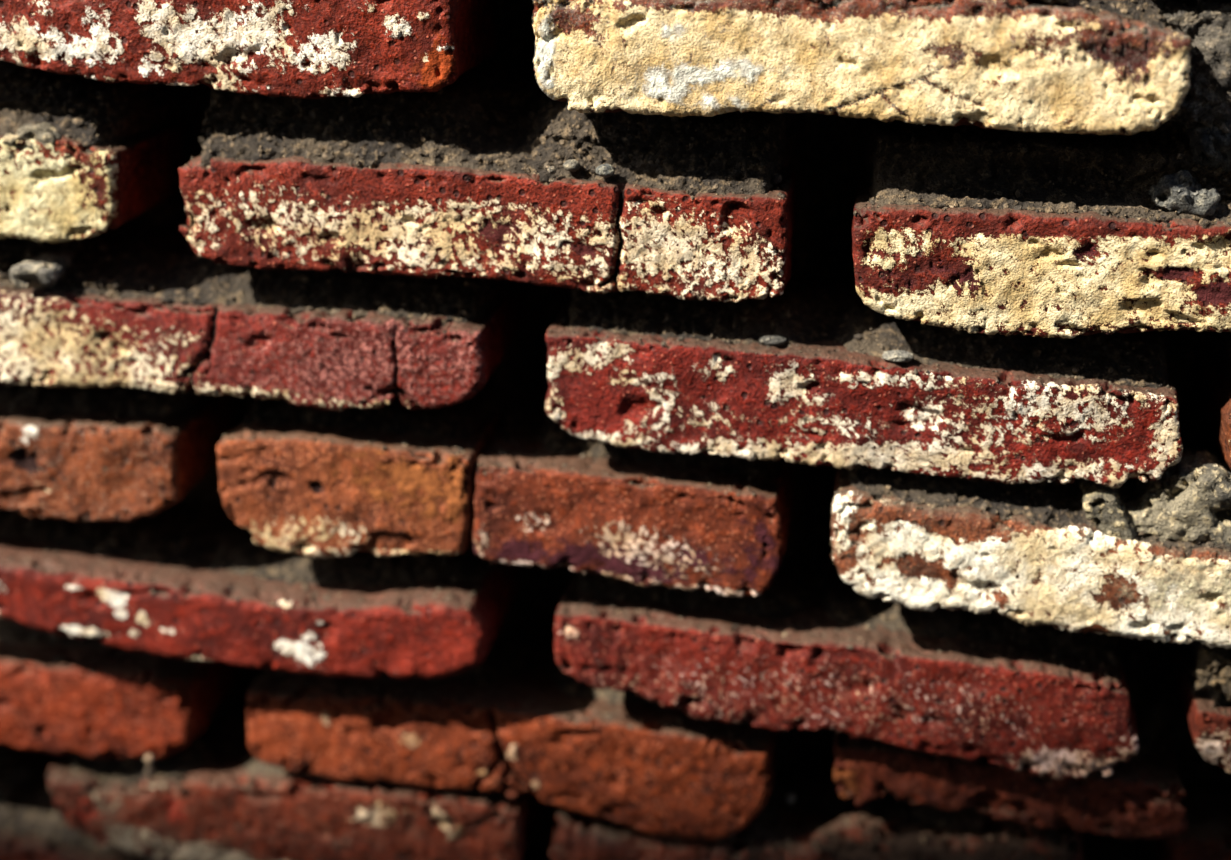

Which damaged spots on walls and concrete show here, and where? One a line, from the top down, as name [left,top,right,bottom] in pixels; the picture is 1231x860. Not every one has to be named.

crack [599,189,625,287]
crack [183,308,219,385]